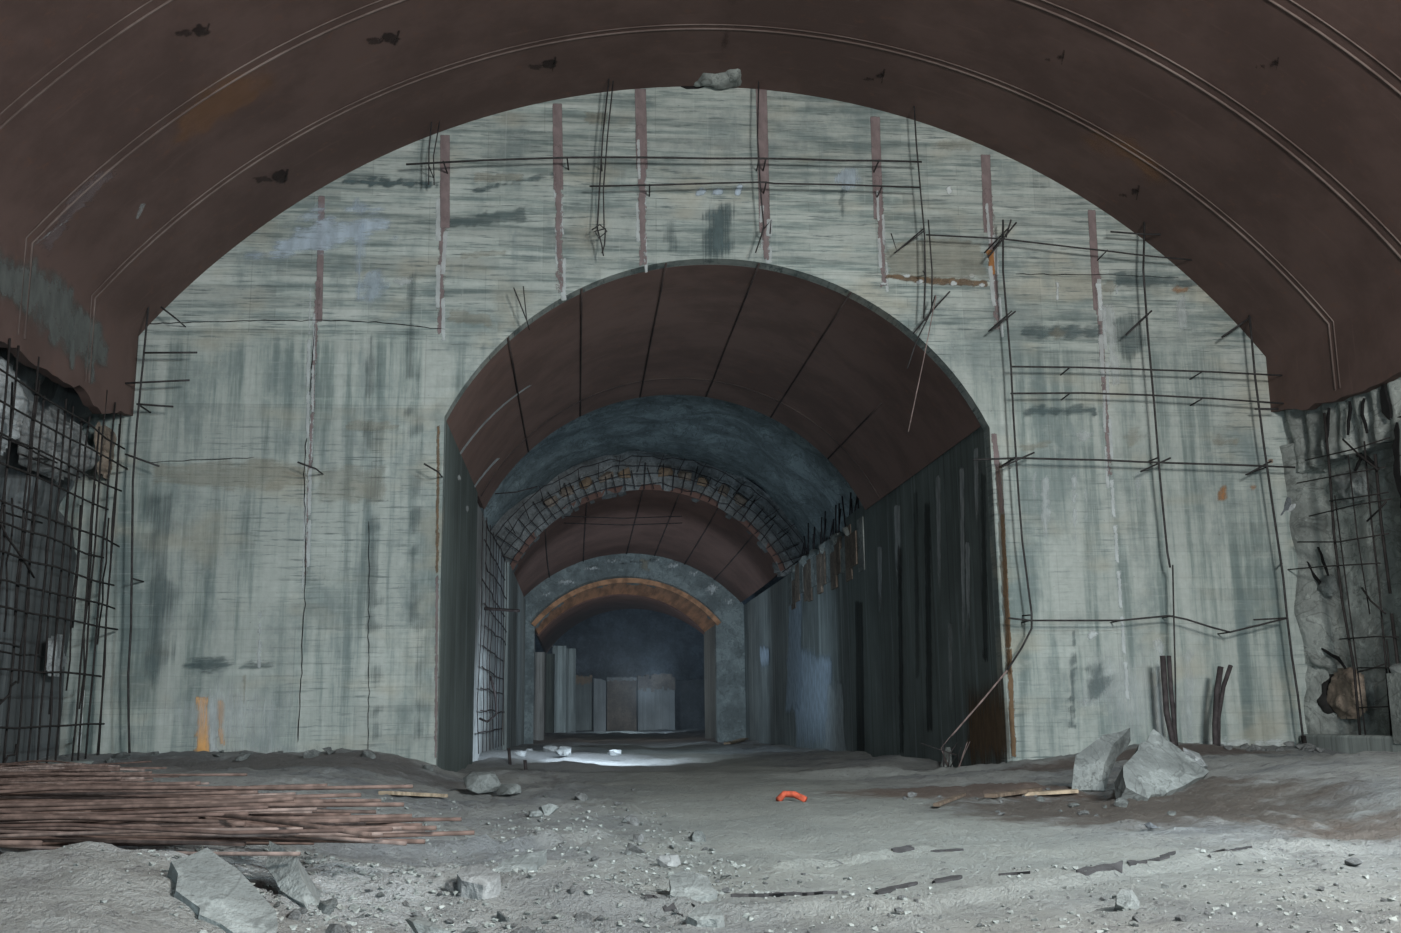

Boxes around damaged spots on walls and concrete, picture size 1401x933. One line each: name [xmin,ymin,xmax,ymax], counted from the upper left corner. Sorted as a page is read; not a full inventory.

spalling [0,356,117,482]
spalling [1281,497,1296,515]
spalling [1332,468,1368,505]
spalling [466,455,865,754]
spalling [46,634,67,677]